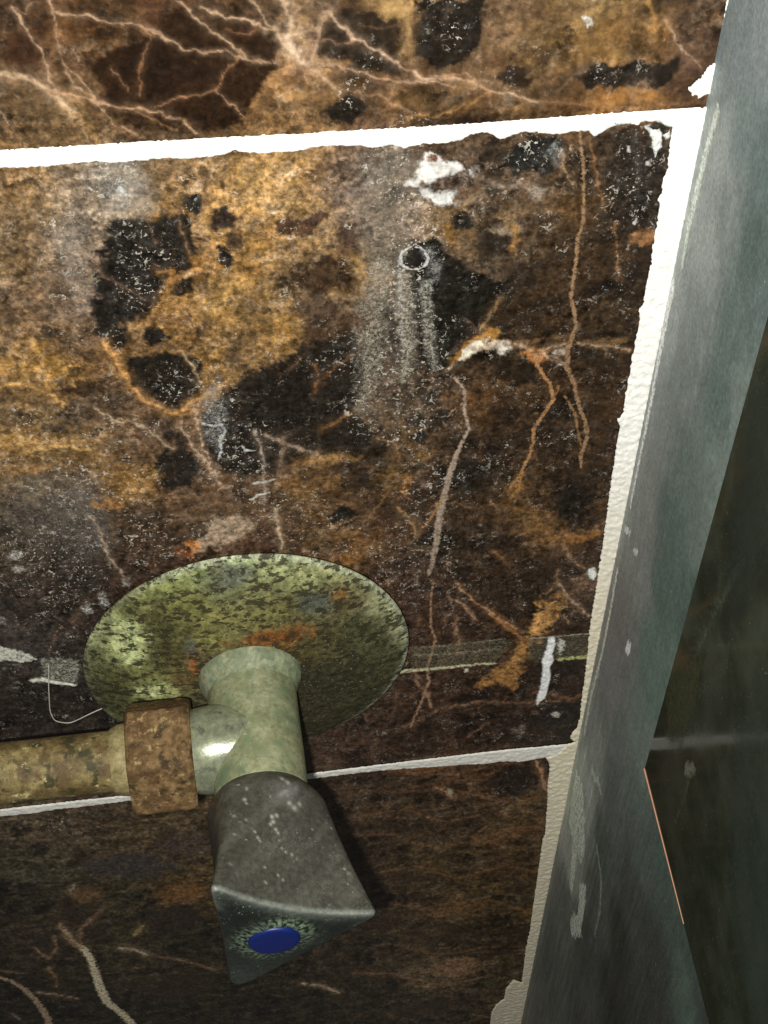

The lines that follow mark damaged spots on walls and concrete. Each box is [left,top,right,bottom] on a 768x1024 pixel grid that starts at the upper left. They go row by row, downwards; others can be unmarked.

water stain [397,246,440,374]